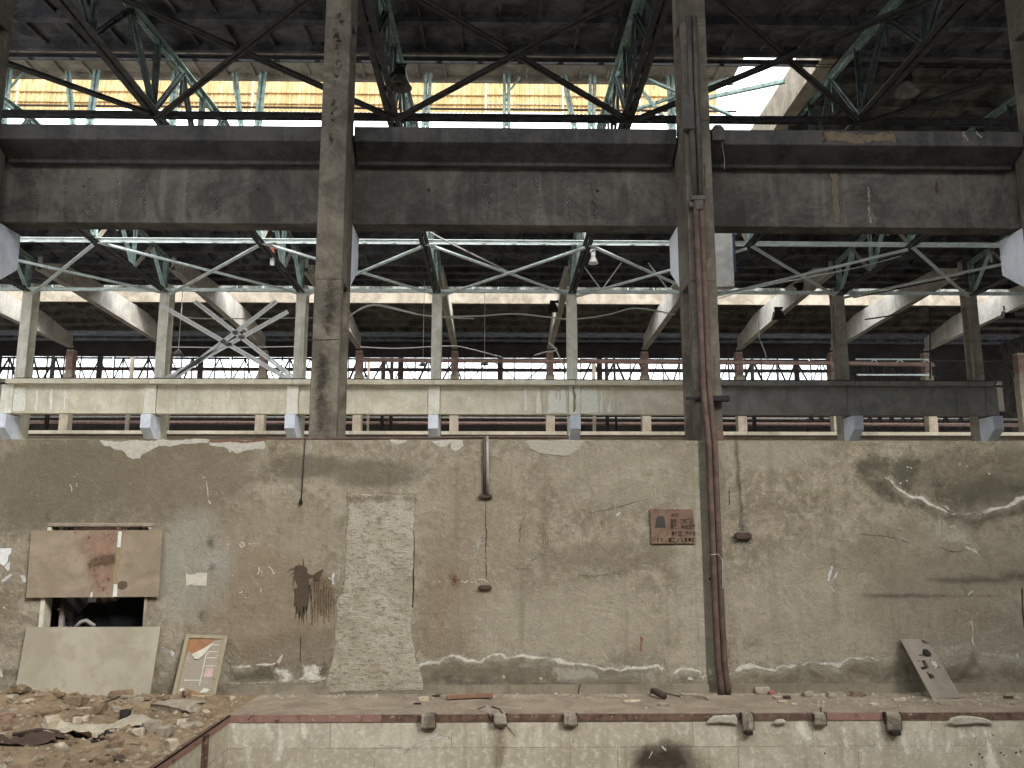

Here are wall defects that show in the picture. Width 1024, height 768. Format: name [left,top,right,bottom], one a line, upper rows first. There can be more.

spalling [99,438,266,459]
water stain [860,459,1024,553]
water stain [287,560,335,626]
efflorescence [417,652,712,682]
efflorescence [729,654,892,676]